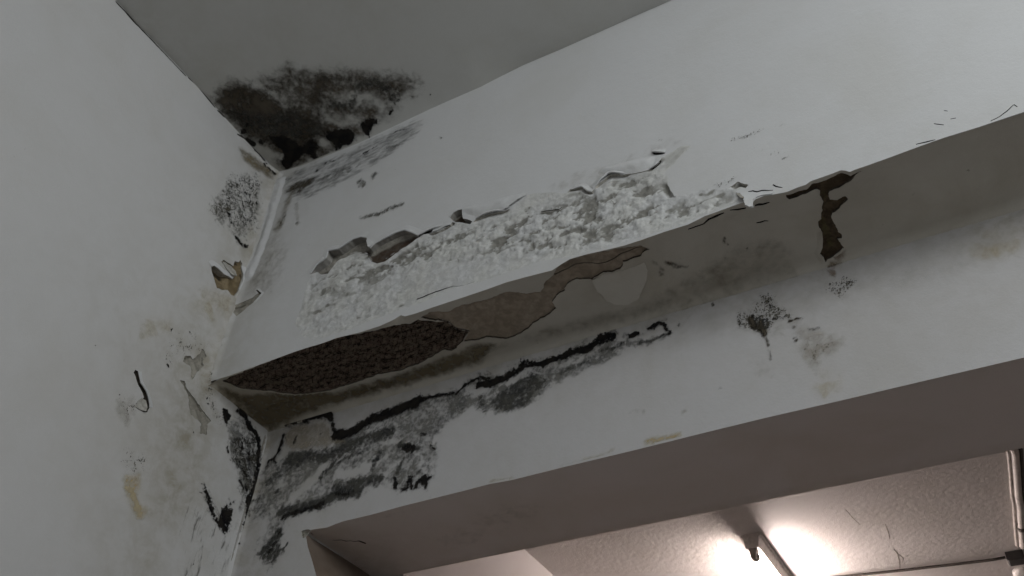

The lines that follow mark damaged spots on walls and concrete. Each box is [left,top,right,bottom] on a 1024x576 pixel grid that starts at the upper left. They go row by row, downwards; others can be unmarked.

water stain [211,68,413,248]
spalling [209,260,264,316]
spalling [308,225,424,274]
flaking render [223,245,649,395]
spalling [448,207,472,224]
water stain [736,294,829,363]
spalling [736,171,861,264]
water stain [201,321,679,563]